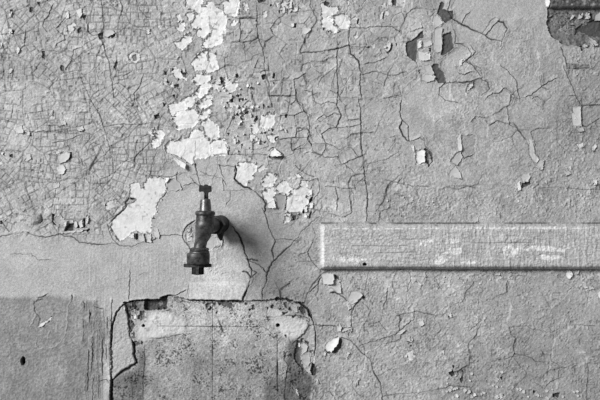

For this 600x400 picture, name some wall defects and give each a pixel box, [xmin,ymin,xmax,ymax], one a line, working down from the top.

crack [24,3,264,206]
peeling [148,0,287,169]
crack [232,1,428,222]
peeling [320,1,360,33]
peeling [406,3,454,83]
crack [439,0,596,129]
spalling [545,0,600,51]
crack [0,220,196,248]
peeling [104,177,182,243]
peeling [234,161,314,223]
flaking render [110,272,365,400]
crack [83,208,471,400]